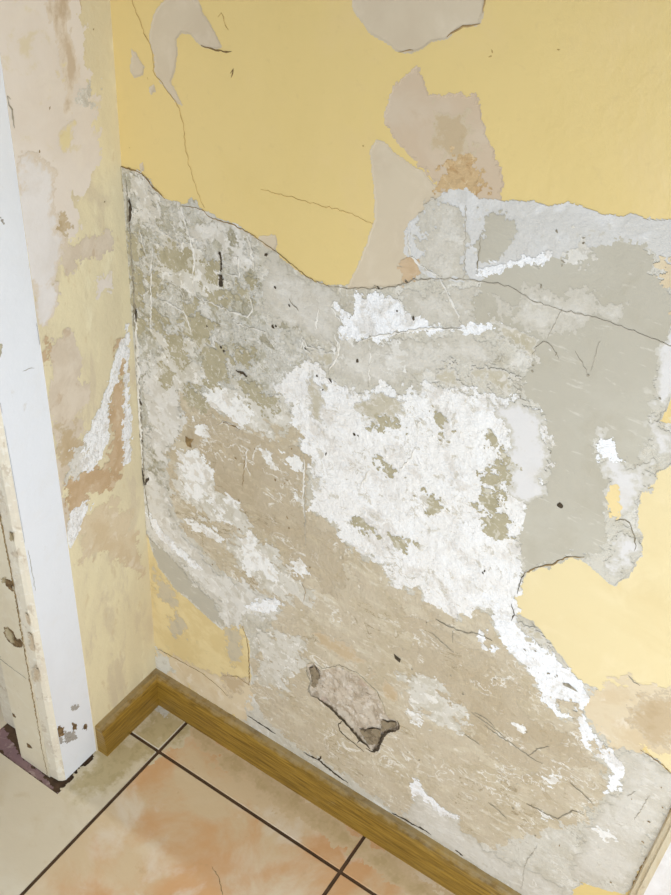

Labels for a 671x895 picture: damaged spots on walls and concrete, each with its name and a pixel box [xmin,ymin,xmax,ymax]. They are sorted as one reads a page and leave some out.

water stain [42,336,52,366]
peeling [0,0,114,276]
crack [121,166,165,545]
peeling [130,0,232,106]
peeling [48,328,477,866]
water stain [53,229,671,853]
peeling [197,65,545,410]
crack [132,1,671,377]
peeling [352,0,486,54]
flaking render [513,362,671,599]
peeling [0,728,58,794]
flaking render [475,607,671,895]